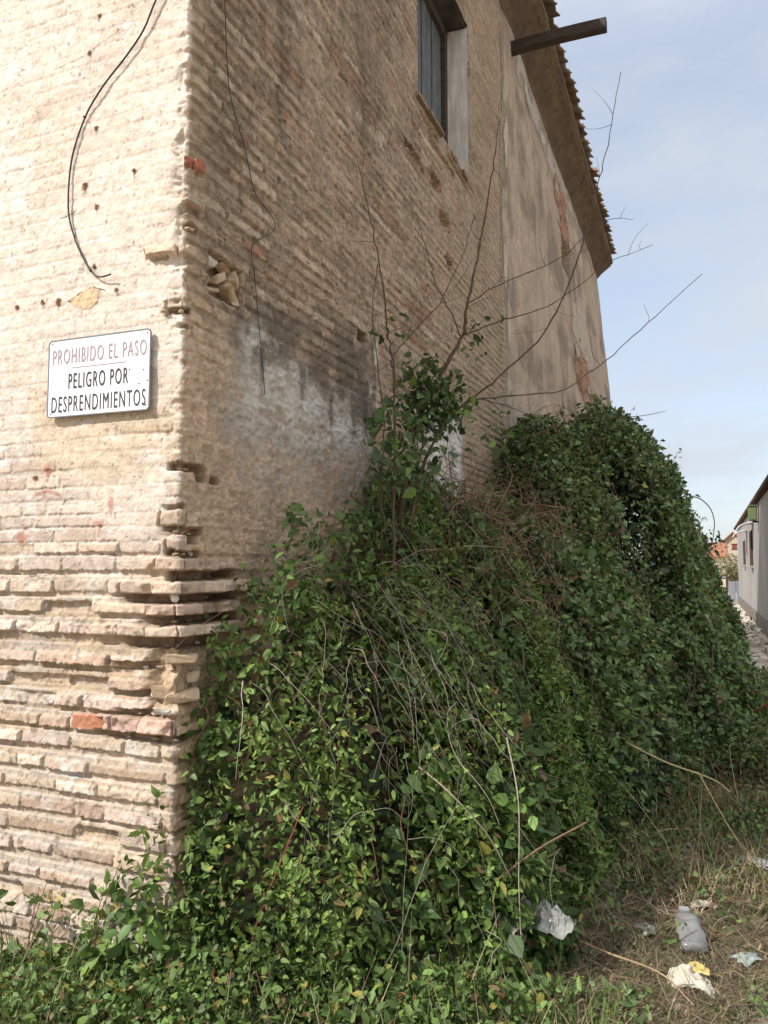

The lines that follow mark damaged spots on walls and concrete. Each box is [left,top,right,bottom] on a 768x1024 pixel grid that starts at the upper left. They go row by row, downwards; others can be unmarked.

peeling [502,39,589,408]
peeling [68,286,105,310]
peeling [205,250,387,482]
damp [301,337,374,430]
peeling [572,298,595,405]